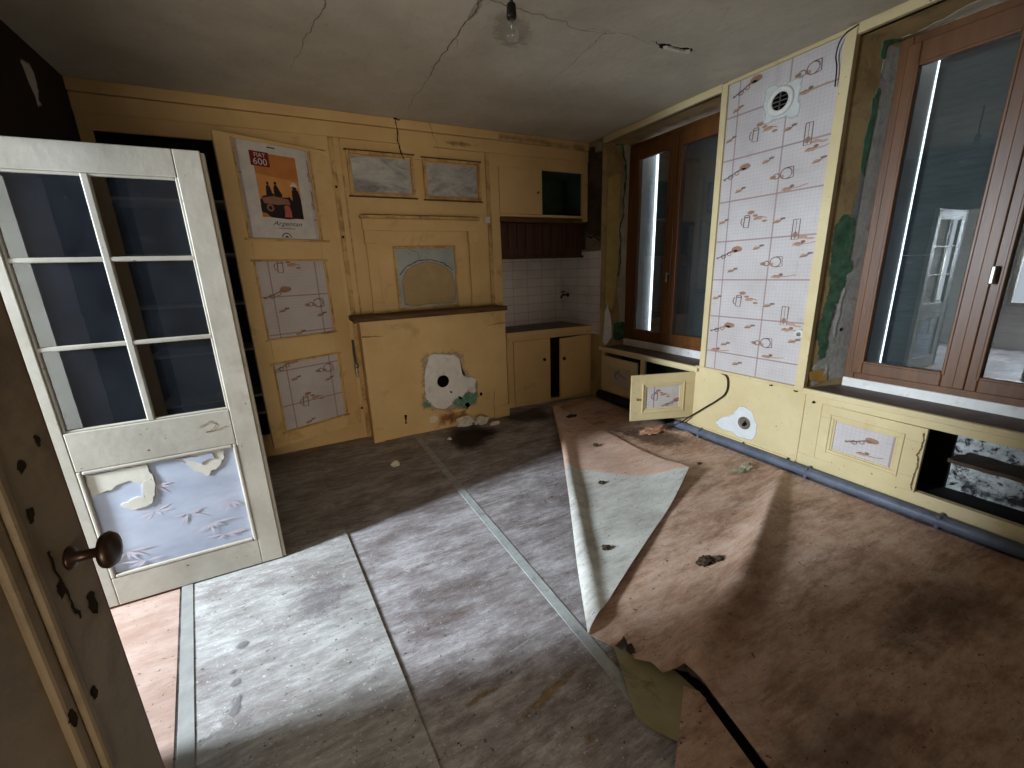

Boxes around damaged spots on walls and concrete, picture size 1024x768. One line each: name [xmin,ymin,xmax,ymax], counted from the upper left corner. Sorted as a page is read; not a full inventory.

crack [393,0,650,159]
flaking render [654,41,693,54]
peeling [809,0,1002,386]
peeling [421,352,482,423]
damp [451,427,496,448]